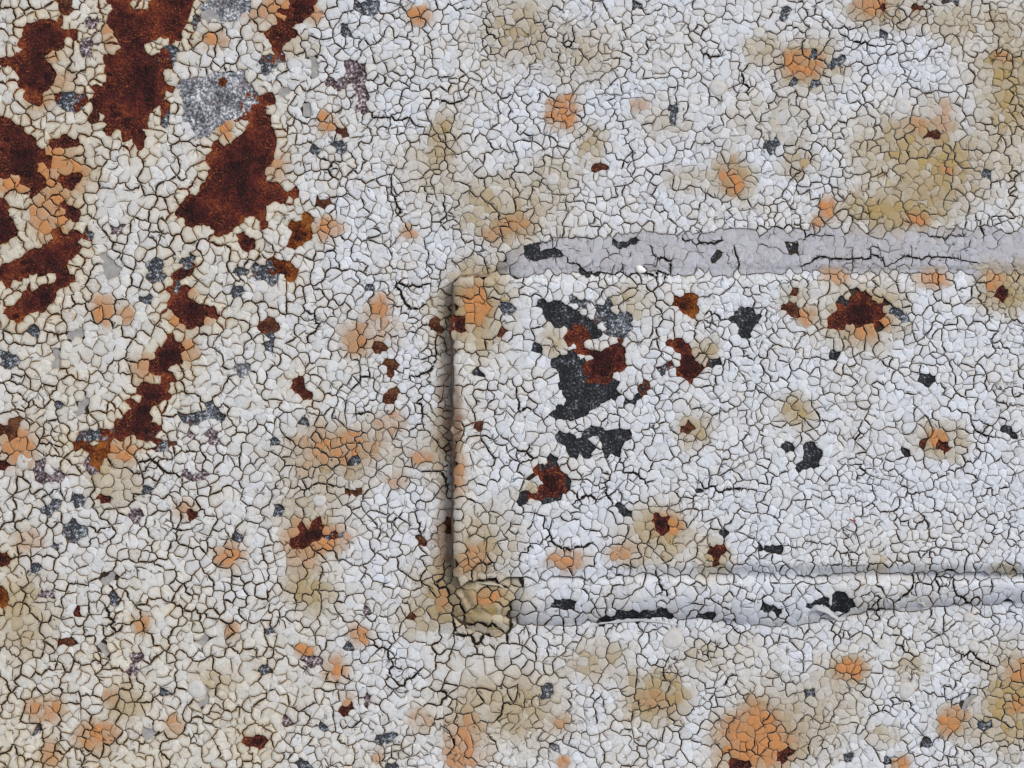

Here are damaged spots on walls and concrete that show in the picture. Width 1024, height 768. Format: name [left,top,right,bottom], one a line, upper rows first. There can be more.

peeling [157,44,285,144]
crack [0,168,66,266]
rust [0,0,226,334]
rust [164,86,343,289]
rust [72,262,230,470]
peeling [536,295,635,344]
crack [577,354,594,362]
rust [563,324,629,385]
crack [584,322,618,352]
crack [139,460,163,481]
peeling [515,342,674,510]
peeling [779,441,823,476]